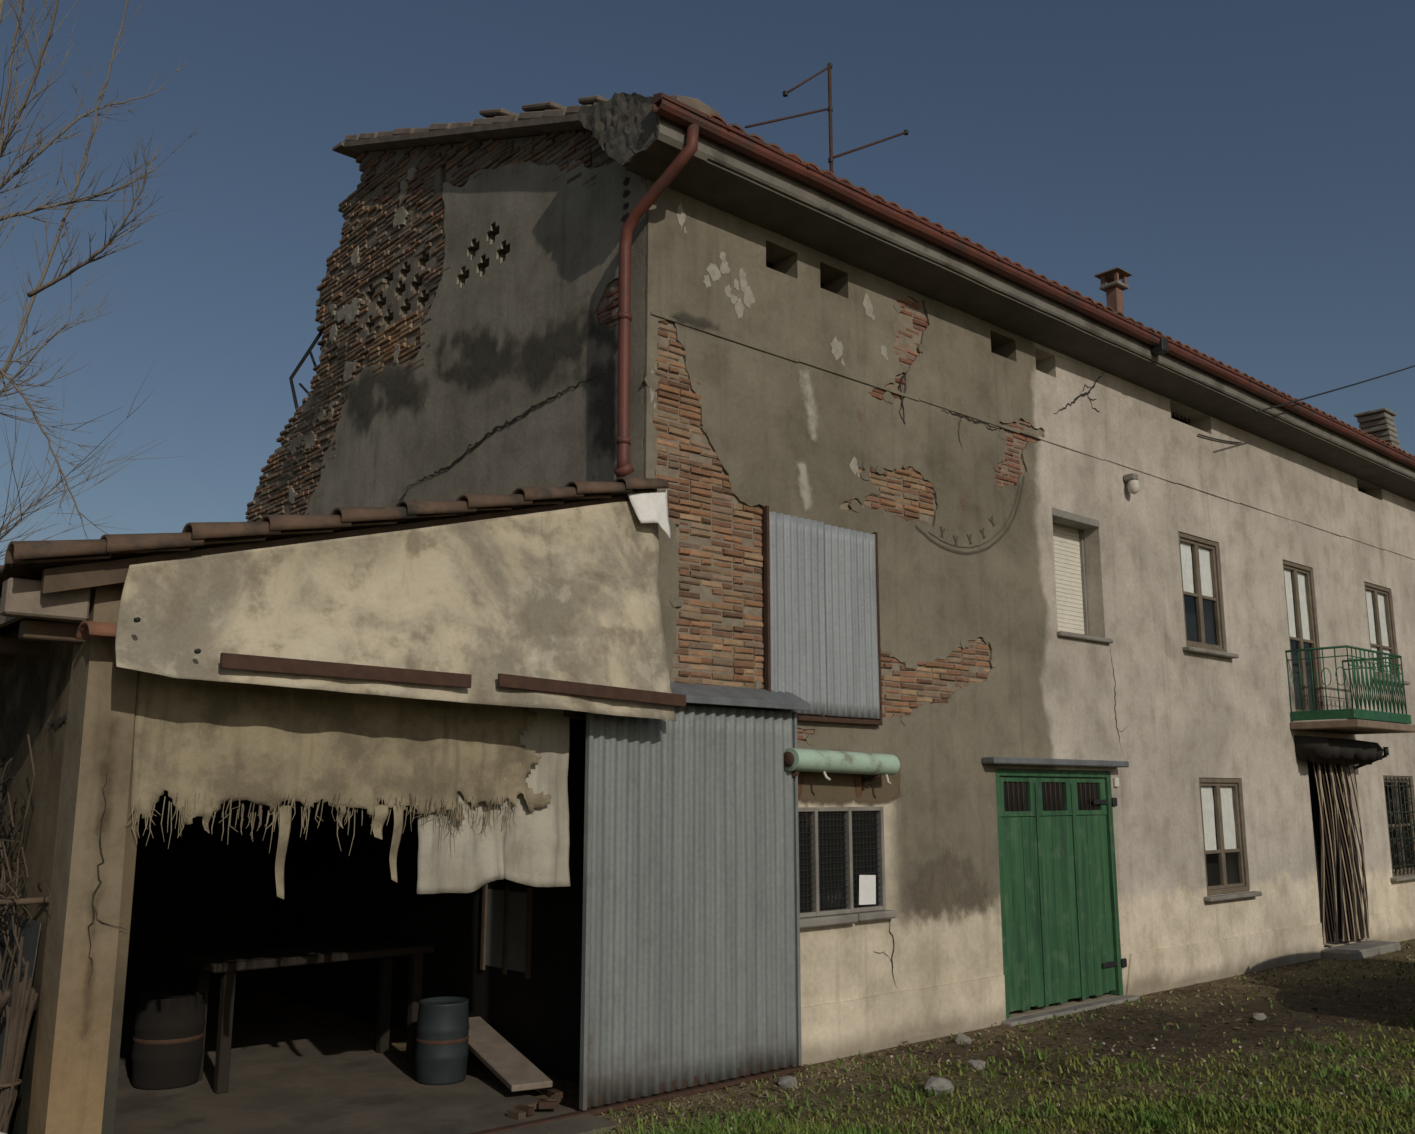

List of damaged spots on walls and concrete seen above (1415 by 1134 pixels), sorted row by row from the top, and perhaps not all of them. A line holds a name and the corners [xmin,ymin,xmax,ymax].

flaking render [245,130,615,522]
water stain [279,314,618,487]
crack [398,375,600,501]
flaking render [643,320,774,689]
peeling [863,293,875,320]
flaking render [839,456,936,525]
flaking render [869,297,928,404]
flaking render [993,421,1043,488]
crack [1054,372,1105,414]
flaking render [881,637,998,725]
crack [874,921,898,988]